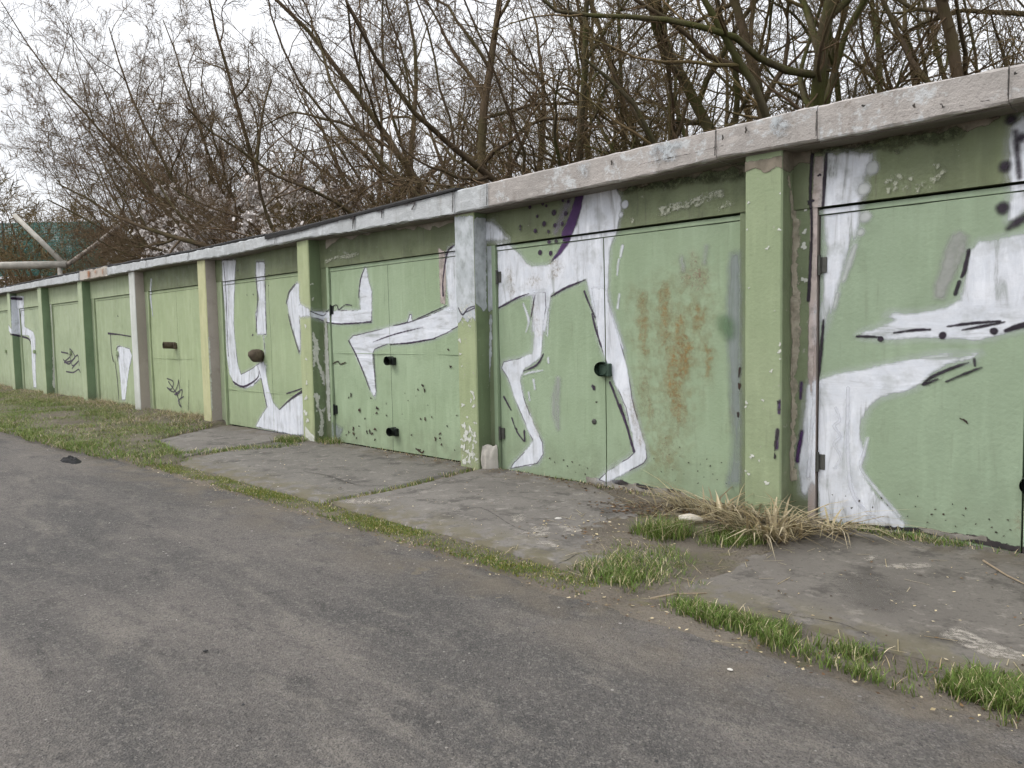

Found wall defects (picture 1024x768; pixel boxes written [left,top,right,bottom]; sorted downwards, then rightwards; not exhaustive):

peeling [885,164,944,193]
peeling [659,190,731,215]
peeling [454,391,478,464]